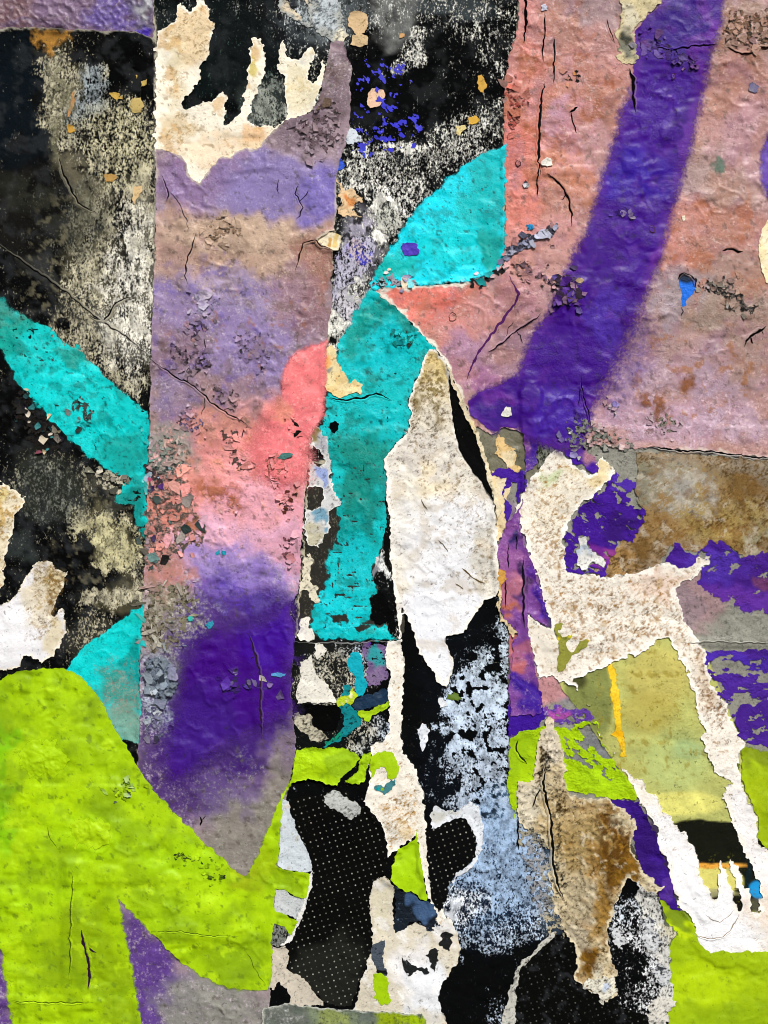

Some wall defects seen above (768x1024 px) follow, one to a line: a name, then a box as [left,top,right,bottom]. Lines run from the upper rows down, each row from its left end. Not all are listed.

peeling [723,7,768,56]
peeling [287,98,344,166]
crack [523,0,575,226]
crack [570,106,578,133]
peeling [460,221,588,314]
crack [467,276,541,379]
crack [150,359,251,437]
peeling [164,285,300,569]
peeling [84,404,239,744]
crack [248,633,264,737]
crack [513,740,565,901]
crack [9,871,96,1006]